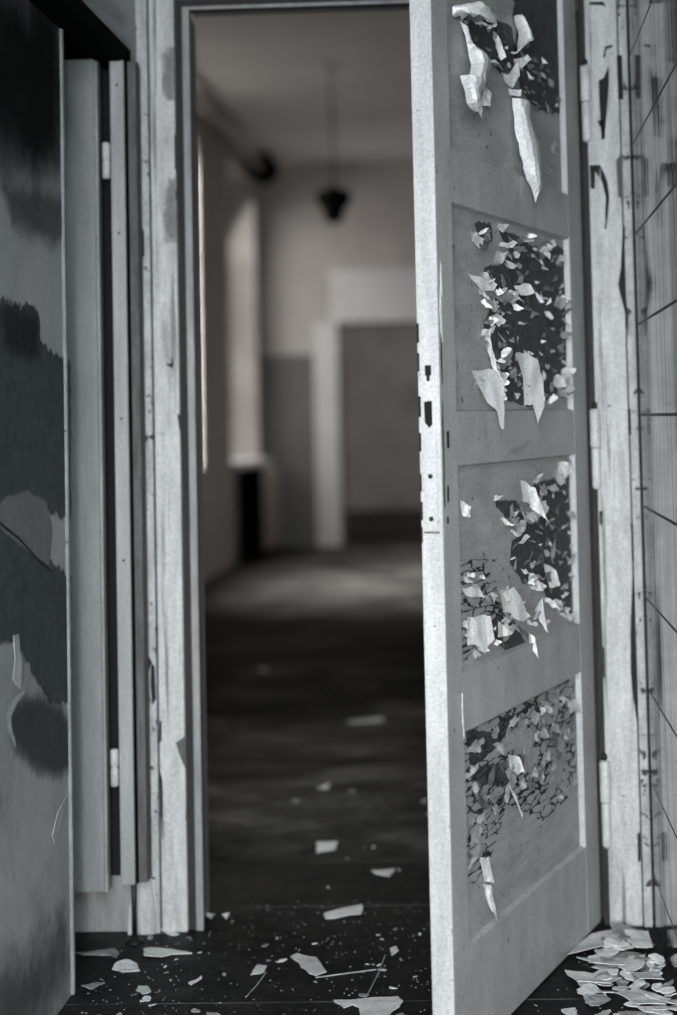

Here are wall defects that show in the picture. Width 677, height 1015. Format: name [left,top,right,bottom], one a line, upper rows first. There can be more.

peeling [452,0,561,202]
peeling [0,296,72,706]